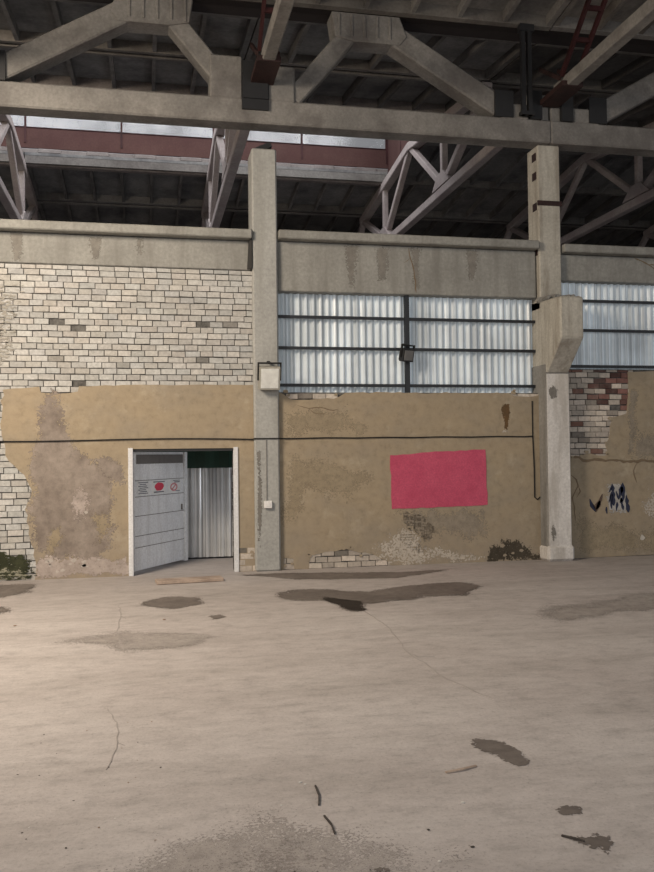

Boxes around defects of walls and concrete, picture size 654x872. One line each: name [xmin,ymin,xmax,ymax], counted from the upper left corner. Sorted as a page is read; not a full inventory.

rust [501,404,511,433]
flaking render [569,370,633,460]
water stain [23,388,128,560]
crack [571,455,654,521]
flaking render [306,546,390,568]
water stain [244,505,489,580]
water stain [324,597,368,611]
crack [106,708,125,770]
water stain [97,805,472,872]
water stain [573,833,615,855]